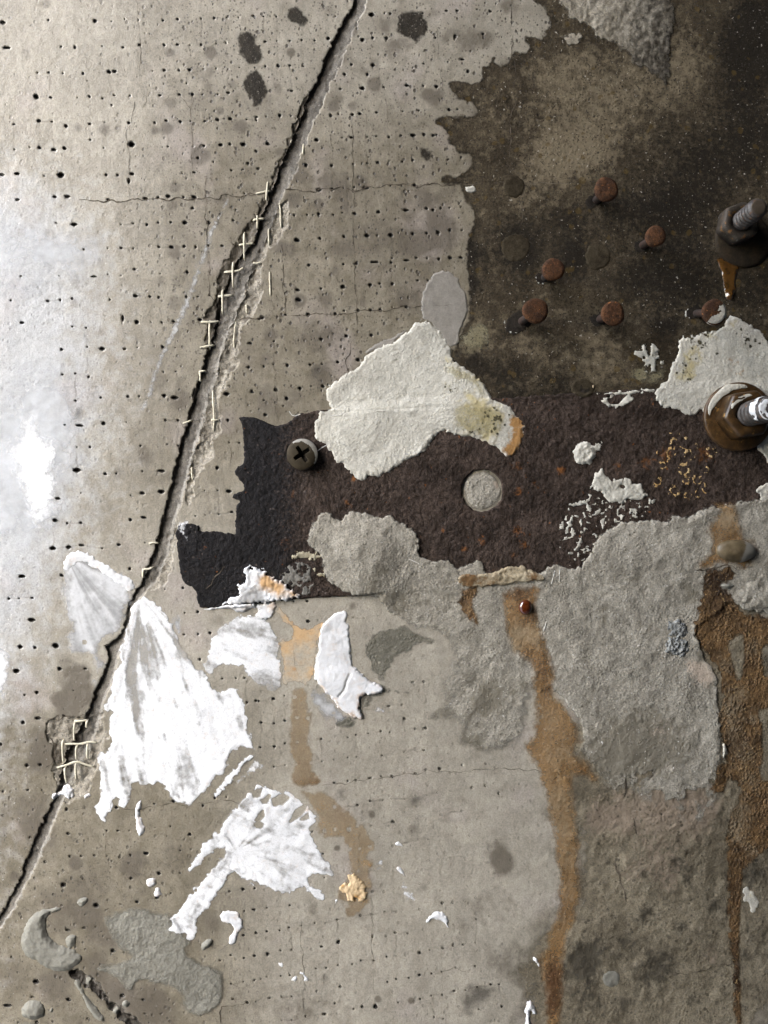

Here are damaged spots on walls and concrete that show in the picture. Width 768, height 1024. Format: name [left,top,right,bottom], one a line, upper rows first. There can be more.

crack [79,92,257,324]
water stain [435,0,768,435]
crack [38,714,85,766]
spalling [46,714,110,804]
crack [76,799,236,903]
peeling [314,611,384,719]
corrosion [504,587,594,1024]
corrosion [693,504,768,1024]